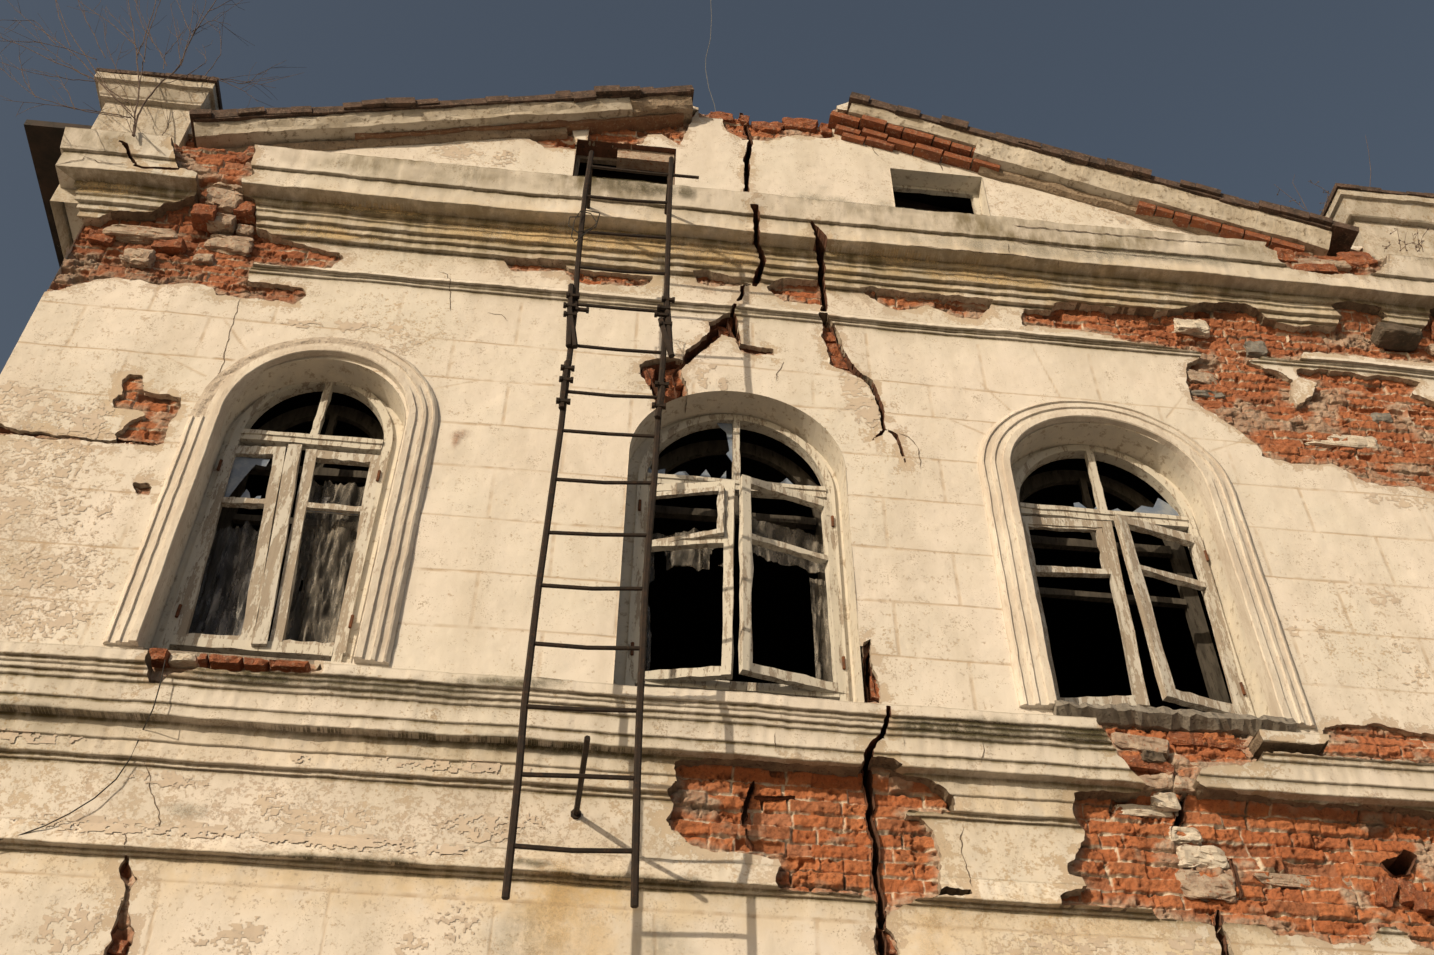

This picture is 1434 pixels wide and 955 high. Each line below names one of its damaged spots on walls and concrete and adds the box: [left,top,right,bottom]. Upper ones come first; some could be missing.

flaking render [0,374,181,641]
flaking render [47,134,421,356]
crack [646,113,766,403]
flaking render [537,107,1001,173]
crack [810,221,921,466]
flaking render [1021,301,1434,511]
crack [103,823,137,955]
flaking render [666,742,981,931]
crack [861,643,899,955]
crack [1171,792,1187,837]
flaking render [991,723,1434,955]
crack [1213,859,1243,955]